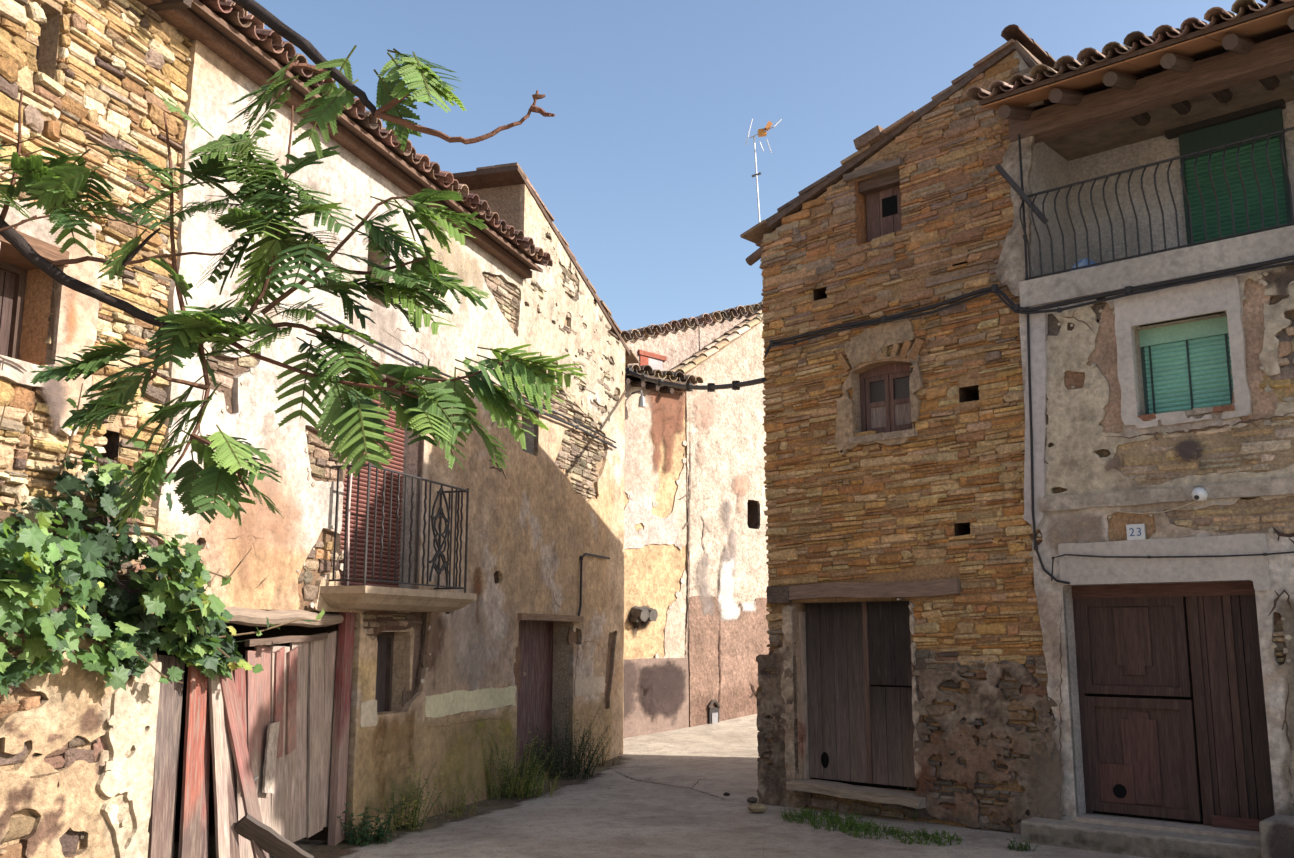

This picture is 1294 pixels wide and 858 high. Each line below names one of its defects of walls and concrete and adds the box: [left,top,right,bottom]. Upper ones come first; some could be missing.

spalling [502,374,609,502]
spalling [1048,314,1075,336]
spalling [1059,264,1294,485]
damp [232,485,299,577]
damp [623,661,685,719]
peeling [96,658,162,858]